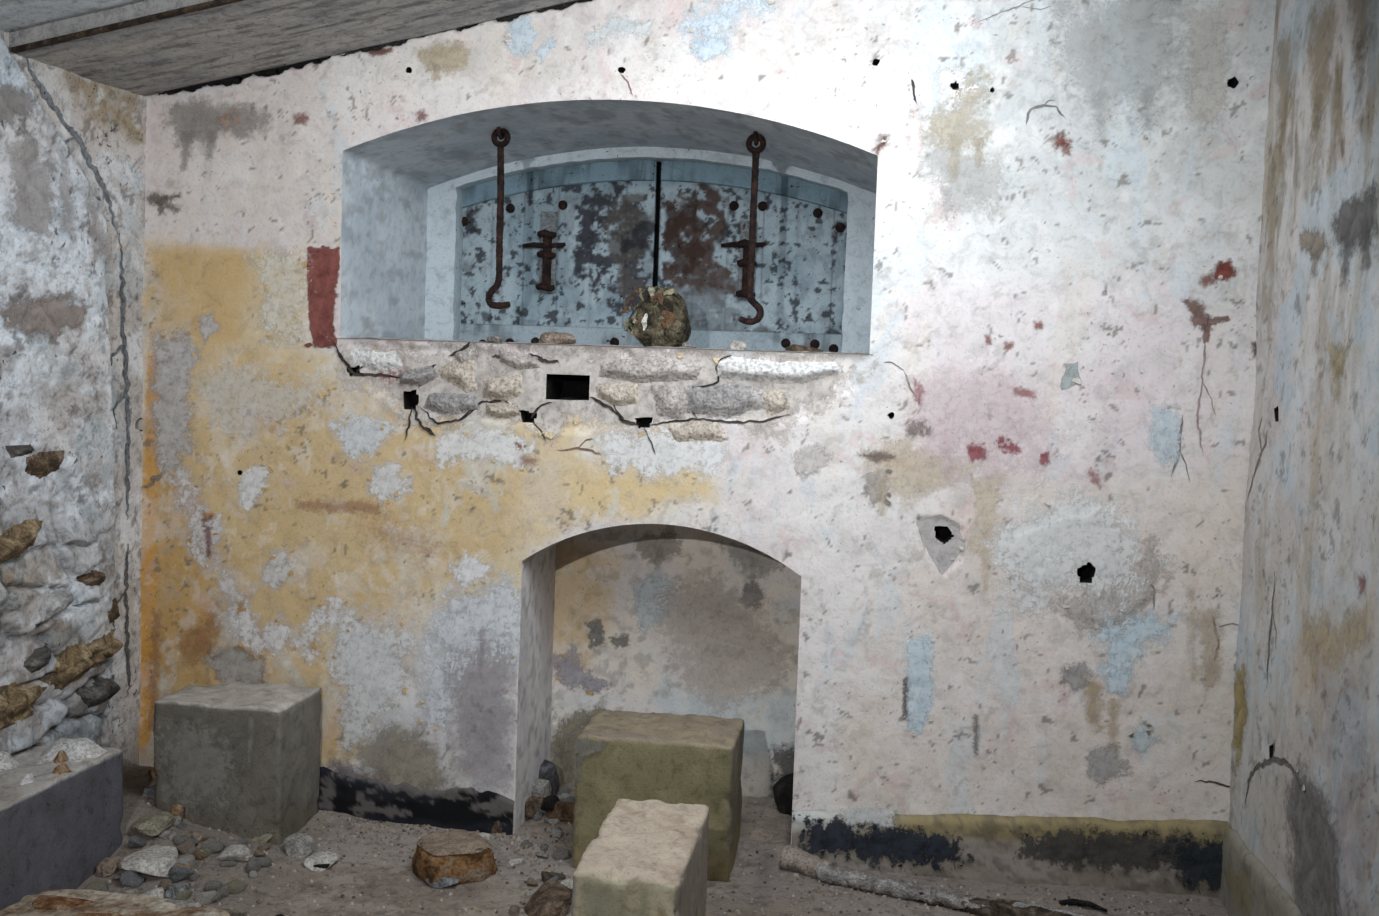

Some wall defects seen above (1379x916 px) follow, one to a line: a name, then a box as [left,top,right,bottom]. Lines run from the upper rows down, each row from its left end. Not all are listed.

crack [333,342,794,455]
spalling [135,245,875,759]
spalling [916,515,966,574]
crack [1195,749,1301,801]